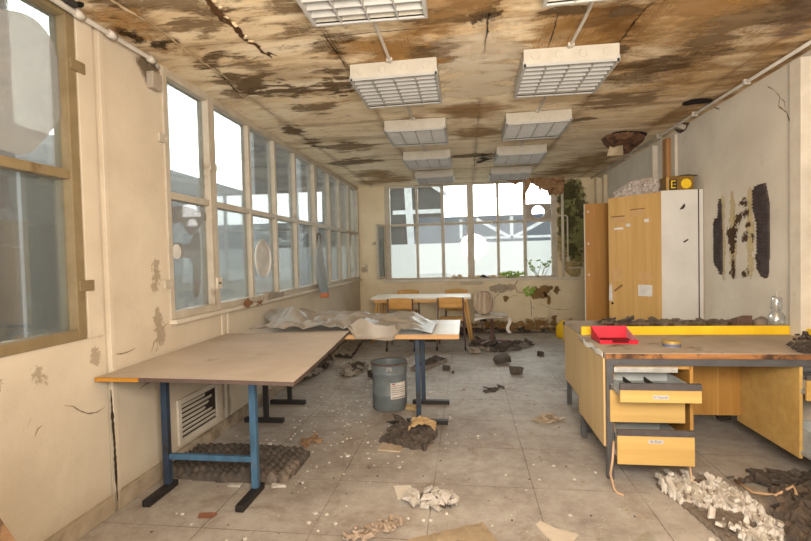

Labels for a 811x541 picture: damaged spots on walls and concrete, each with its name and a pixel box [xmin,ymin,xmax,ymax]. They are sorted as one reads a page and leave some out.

crack [205,0,277,58]
damp [82,0,504,114]
damp [524,0,811,125]
damp [281,125,415,185]
damp [437,102,503,117]
damp [454,153,494,164]
damp [454,128,501,137]
peeling [726,197,754,279]
peeling [151,259,161,291]
spalling [530,285,560,305]
peeling [153,308,166,346]
crack [64,394,118,501]